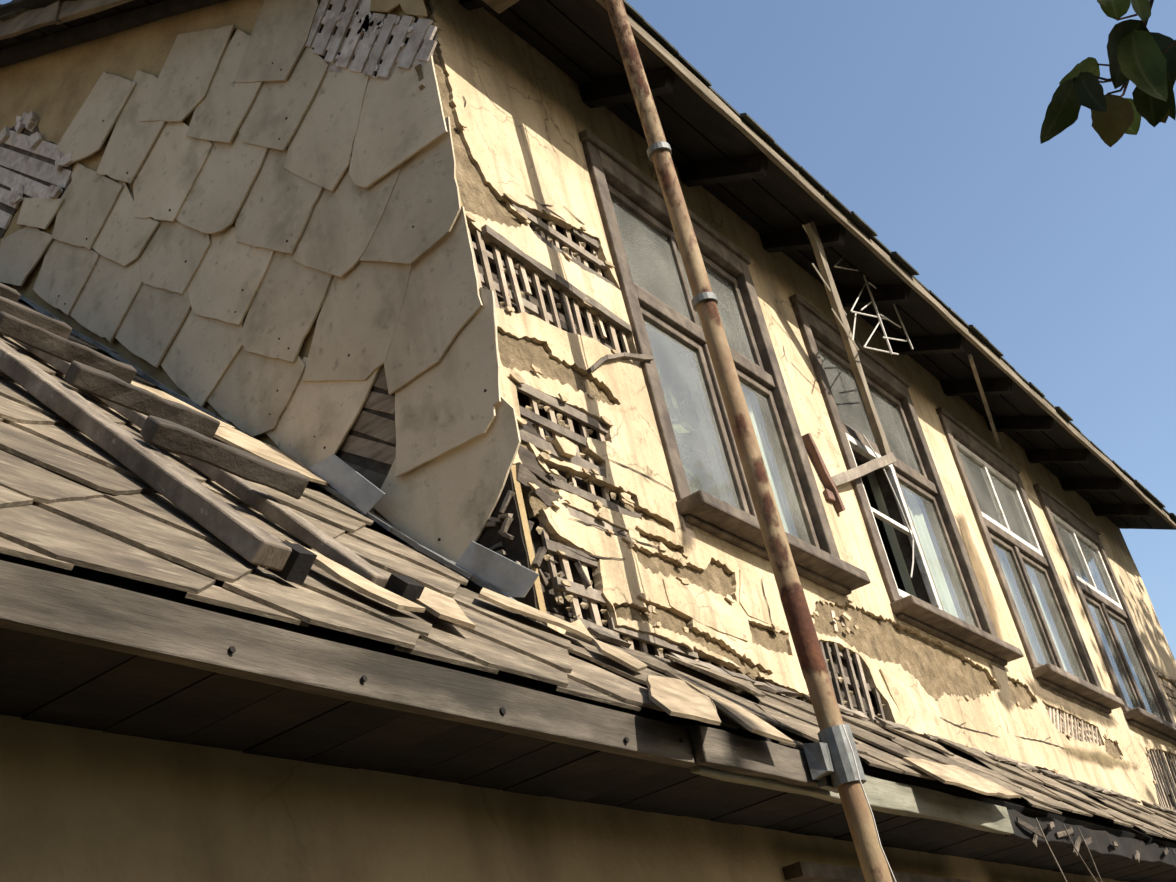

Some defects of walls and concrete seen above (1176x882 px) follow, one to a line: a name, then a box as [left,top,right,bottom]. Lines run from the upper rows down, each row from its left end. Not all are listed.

peeling [370,0,442,31]
peeling [0,111,42,150]
flaking render [414,47,531,228]
flaking render [497,330,614,426]
flaking render [520,442,572,519]
flaking render [813,600,1064,711]